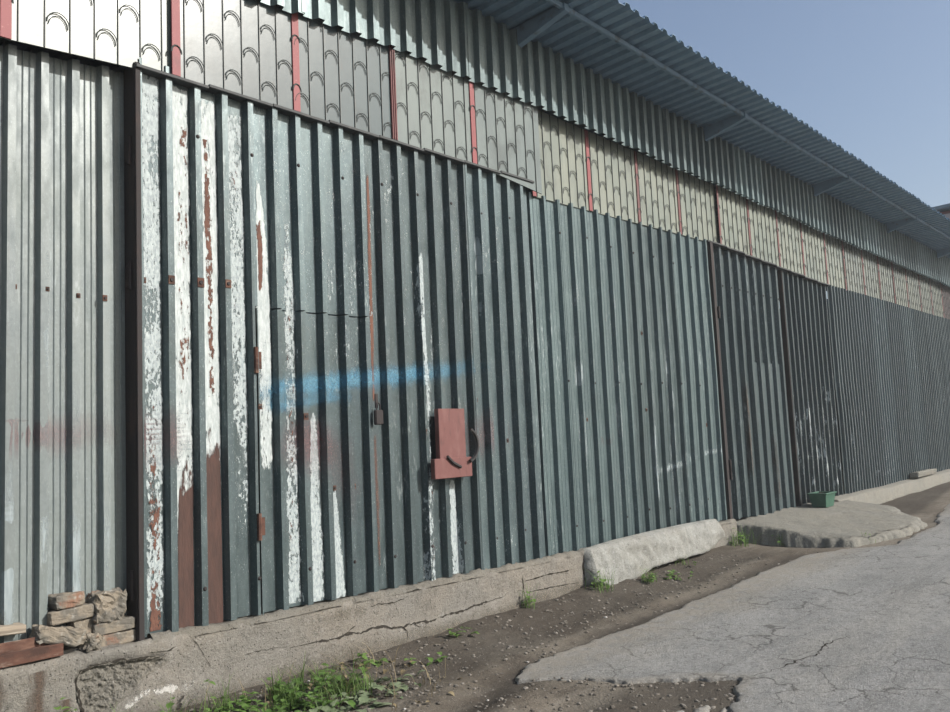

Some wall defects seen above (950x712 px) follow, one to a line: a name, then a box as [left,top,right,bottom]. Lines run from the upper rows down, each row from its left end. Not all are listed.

spalling [75,647,174,712]
peeling [142,74,165,632]
peeling [172,85,194,628]
peeling [201,99,223,624]
peeling [228,115,248,528]
peeling [256,161,346,604]
peeling [322,234,369,363]
crack [247,555,585,654]
peeling [409,239,465,581]
peeling [795,386,841,491]